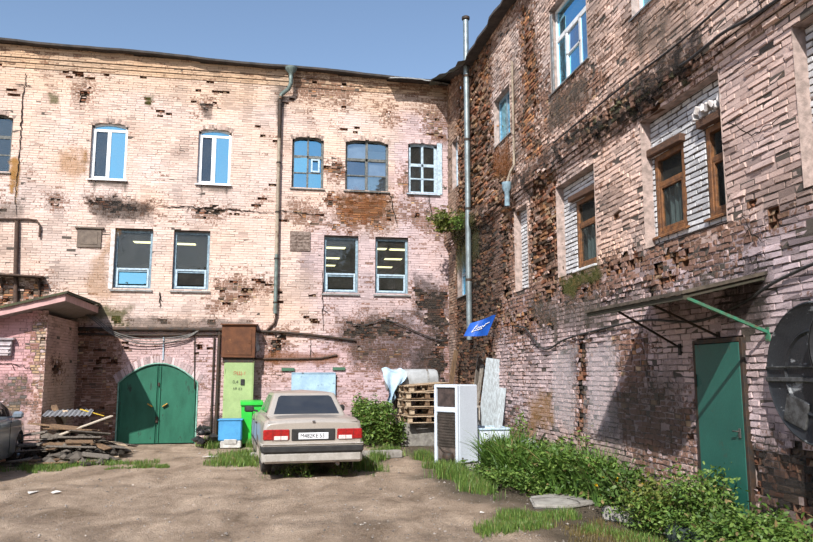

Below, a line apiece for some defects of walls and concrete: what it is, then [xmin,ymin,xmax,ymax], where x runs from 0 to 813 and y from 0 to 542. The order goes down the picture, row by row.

crack [14,74,29,212]
crack [727,113,787,140]
spalling [89,196,136,213]
crack [165,206,315,217]
spalling [279,190,394,234]
peeling [397,172,444,241]
spalling [411,0,714,405]
spalling [0,278,55,306]
peeling [205,276,283,325]
damp [411,280,448,381]